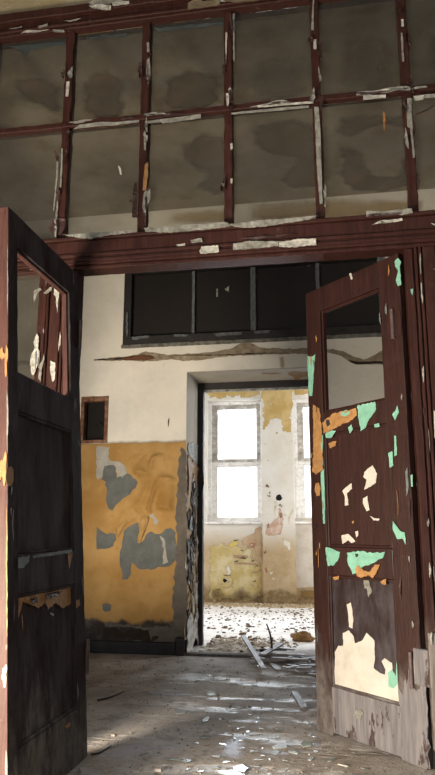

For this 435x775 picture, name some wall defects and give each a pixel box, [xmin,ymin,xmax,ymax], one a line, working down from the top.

peeling [0,394,14,494]
peeling [207,355,380,528]
peeling [6,508,80,630]
peeling [96,443,204,653]
peeling [208,484,291,602]